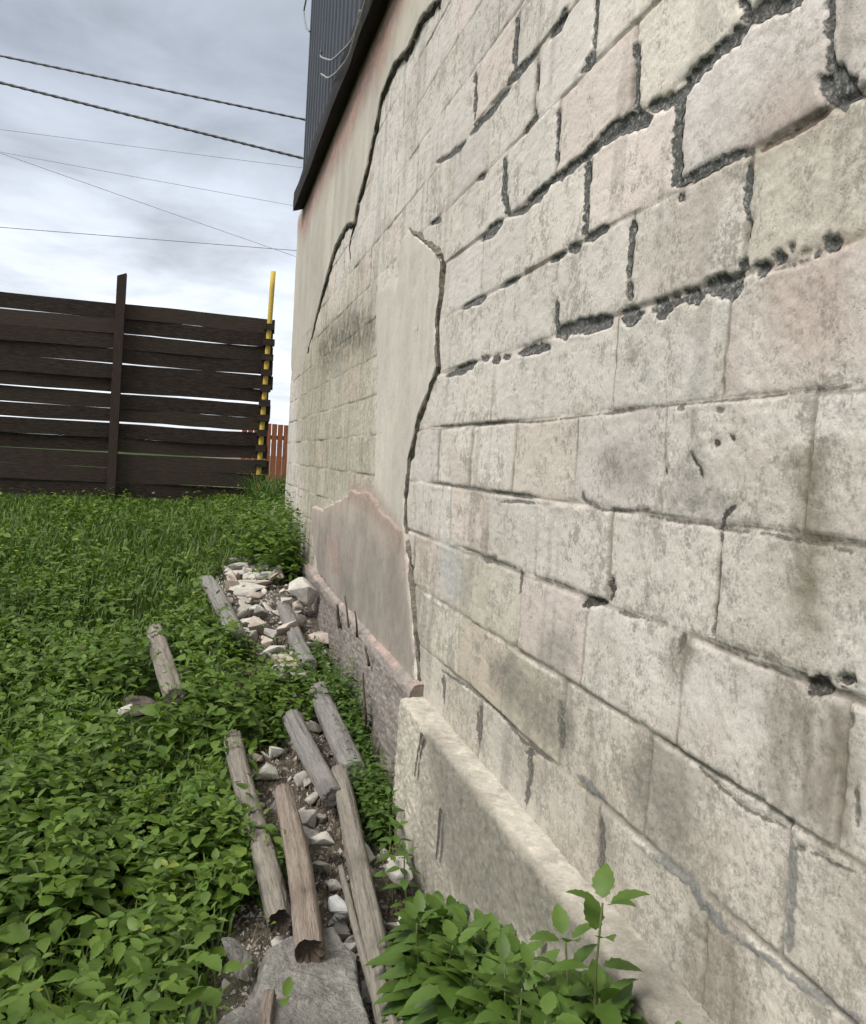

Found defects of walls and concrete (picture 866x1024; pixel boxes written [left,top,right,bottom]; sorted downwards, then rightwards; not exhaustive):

crack [307,0,441,353]
spalling [436,17,540,163]
spalling [482,0,804,263]
spalling [819,0,866,111]
spalling [447,219,842,377]
crack [403,245,862,807]
spalling [808,675,857,696]
crack [434,808,442,860]
crack [699,766,856,873]
crack [853,786,861,827]